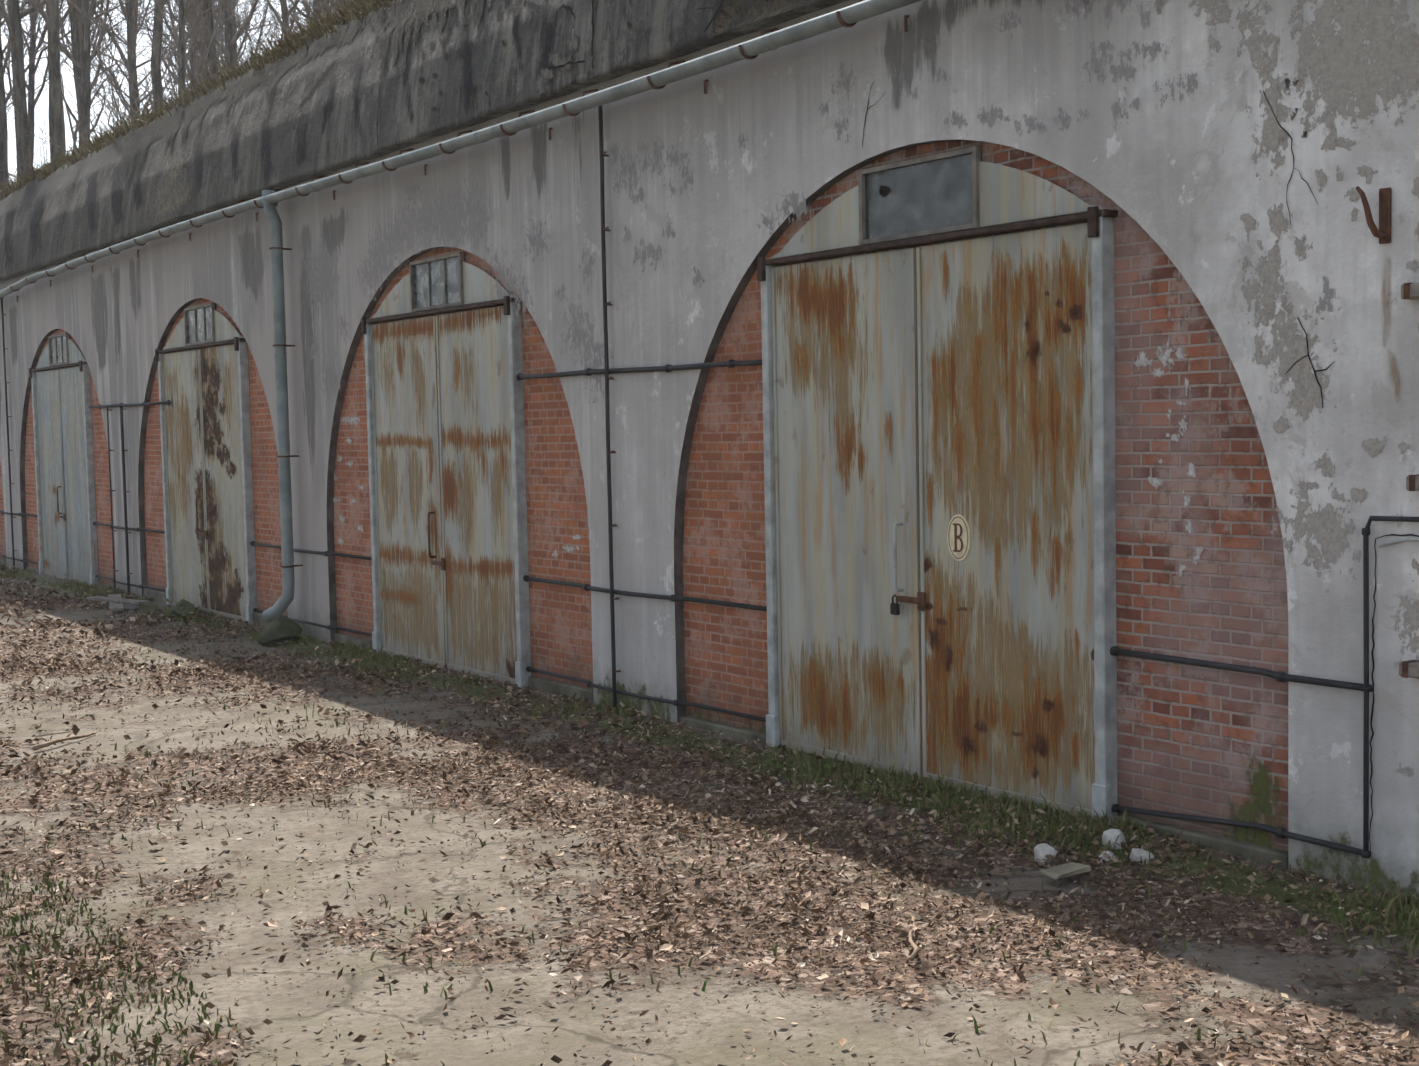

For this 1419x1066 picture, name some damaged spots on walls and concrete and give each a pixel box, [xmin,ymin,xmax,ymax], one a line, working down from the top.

water stain [494,0,575,71]
water stain [296,53,364,165]
water stain [501,136,510,198]
water stain [532,123,546,197]
crack [1263,90,1318,224]
peeling [1239,202,1345,433]
crack [1286,317,1335,408]
rust [165,347,244,616]
rust [372,306,517,679]
rust [775,237,1095,799]
peeling [1268,444,1368,593]
peeling [1361,436,1410,457]